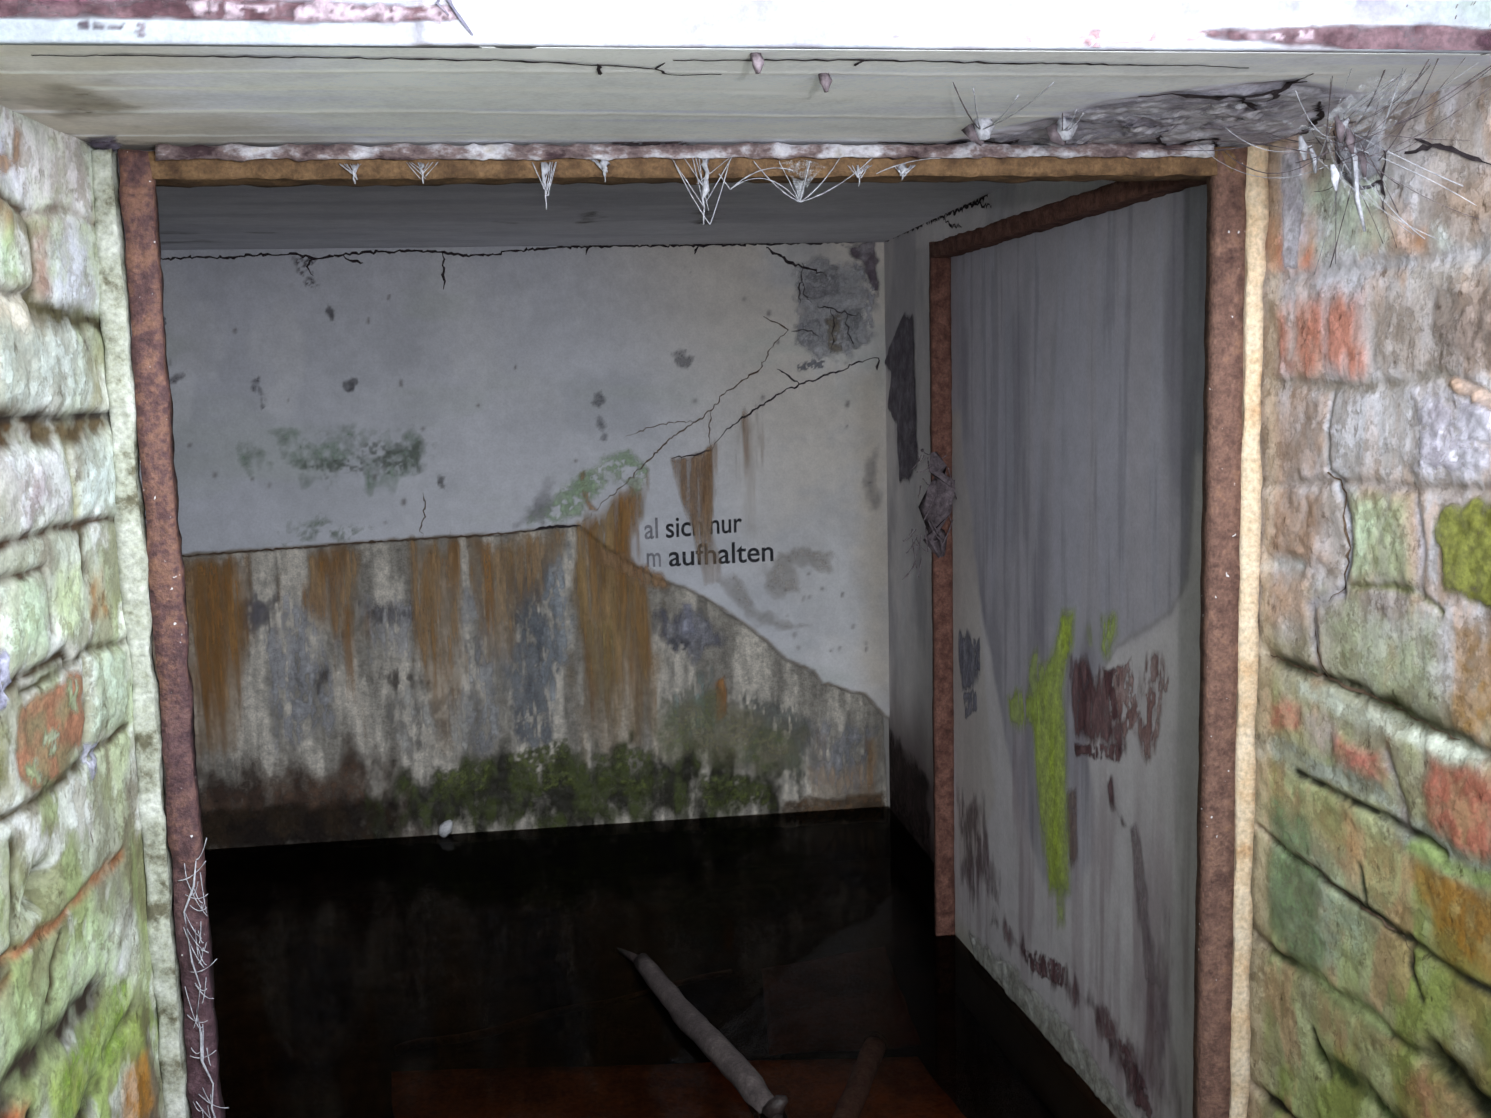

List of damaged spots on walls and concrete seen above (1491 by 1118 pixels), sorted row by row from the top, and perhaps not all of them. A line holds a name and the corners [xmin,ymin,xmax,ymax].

water stain [155,141,1215,162]
crack [32,0,1491,212]
spalling [983,83,1346,147]
crack [161,194,992,557]
flaking render [792,242,879,370]
flaking render [885,314,918,482]
flaking render [182,527,887,838]
water stain [197,747,423,849]
water stain [783,732,930,857]
water stain [970,937,1132,1118]